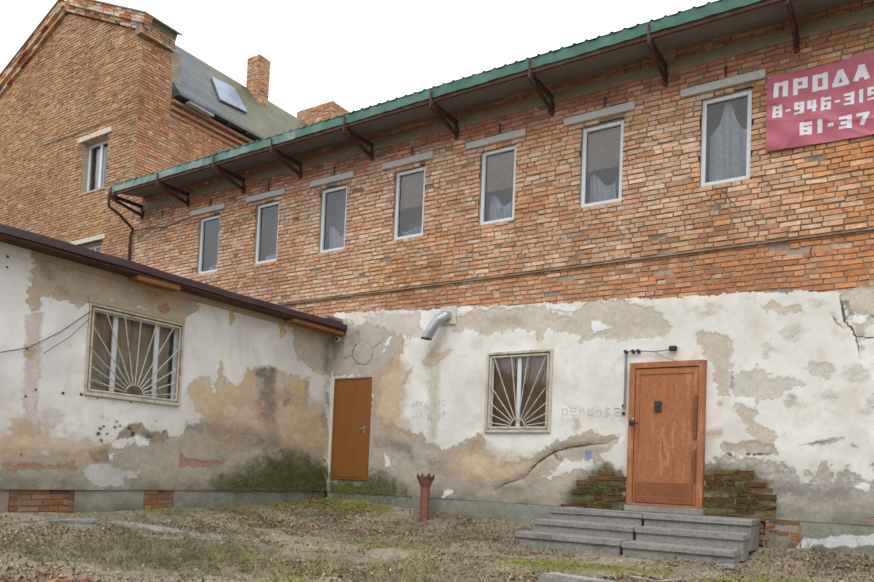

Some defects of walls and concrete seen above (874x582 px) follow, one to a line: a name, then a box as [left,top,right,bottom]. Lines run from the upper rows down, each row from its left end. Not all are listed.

peeling [26,259,199,318]
peeling [293,328,333,378]
peeling [423,350,449,368]
crack [833,293,874,360]
flaking render [0,362,326,491]
crack [498,442,608,488]
flaking render [696,332,874,549]